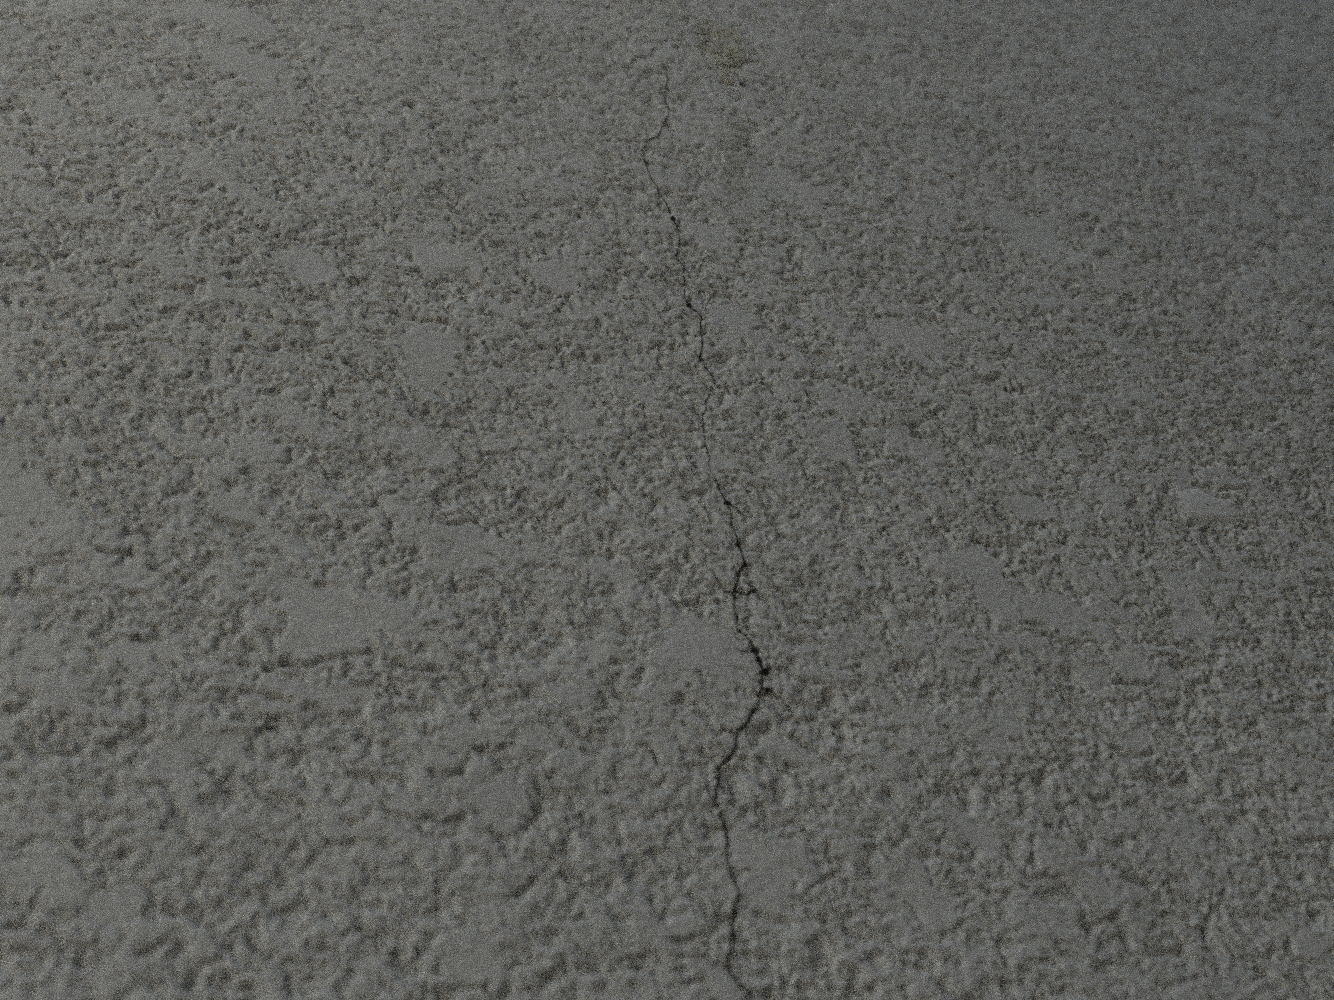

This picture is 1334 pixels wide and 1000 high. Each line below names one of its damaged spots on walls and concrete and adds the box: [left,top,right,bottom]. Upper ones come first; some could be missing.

crack [642,64,778,1000]